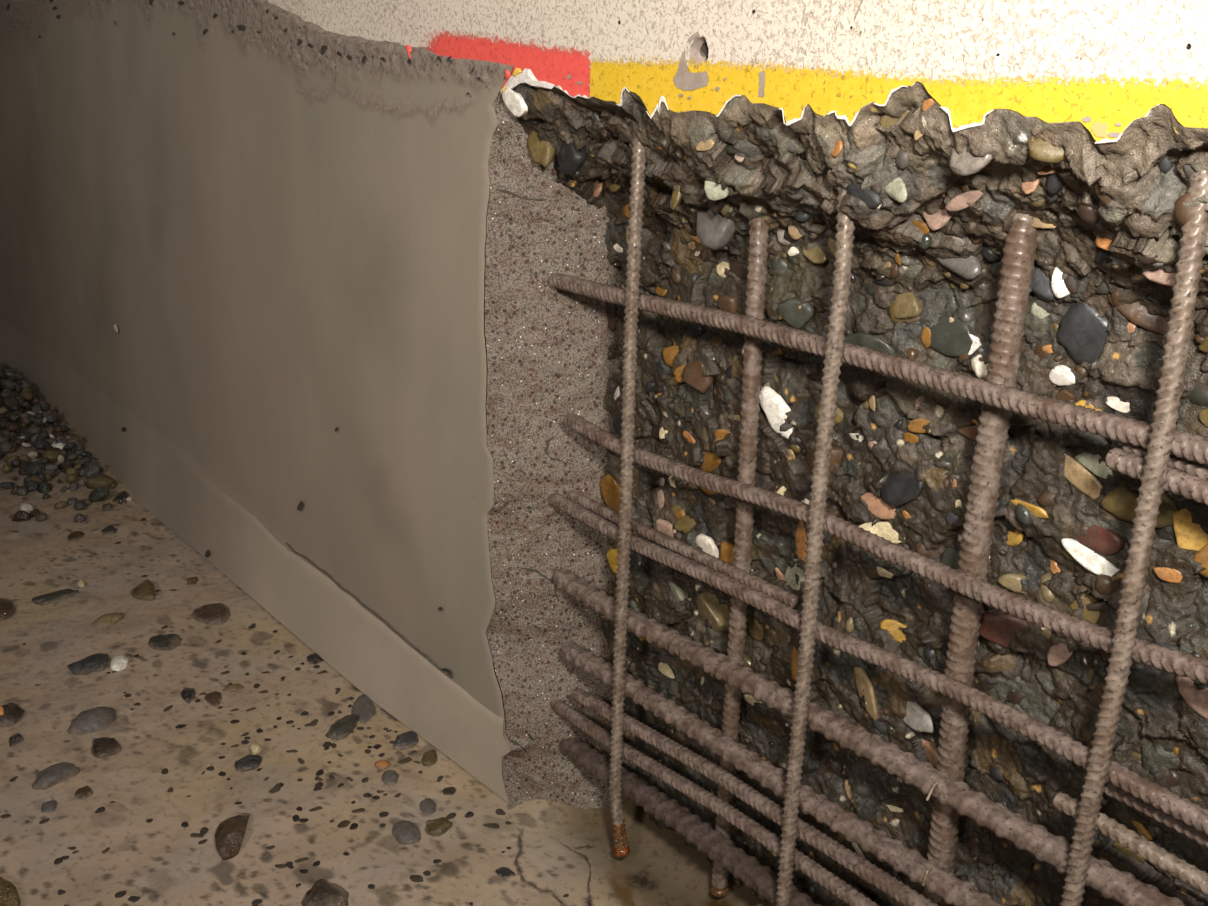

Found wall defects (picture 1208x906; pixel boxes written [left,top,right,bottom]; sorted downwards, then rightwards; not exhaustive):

crack [515,837,591,906]
spalling [494,32,1208,906]